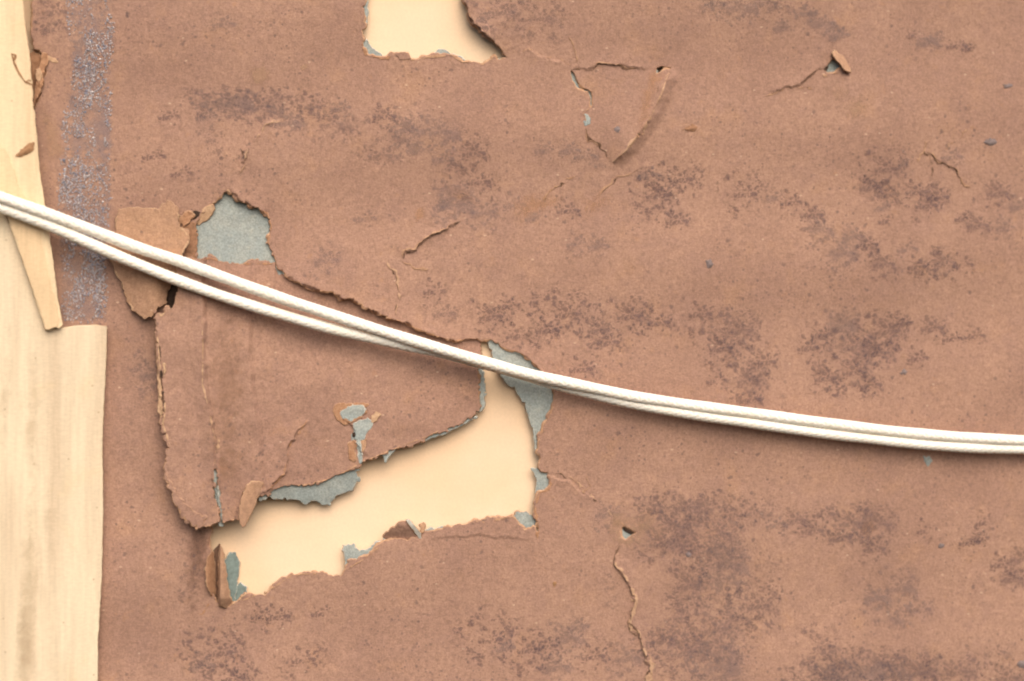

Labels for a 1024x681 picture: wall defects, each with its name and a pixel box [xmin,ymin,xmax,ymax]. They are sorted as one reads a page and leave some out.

peeling [362,0,505,65]
crack [523,38,670,210]
crack [767,50,851,96]
crack [916,126,973,188]
peeling [108,190,553,615]
crack [556,472,656,681]